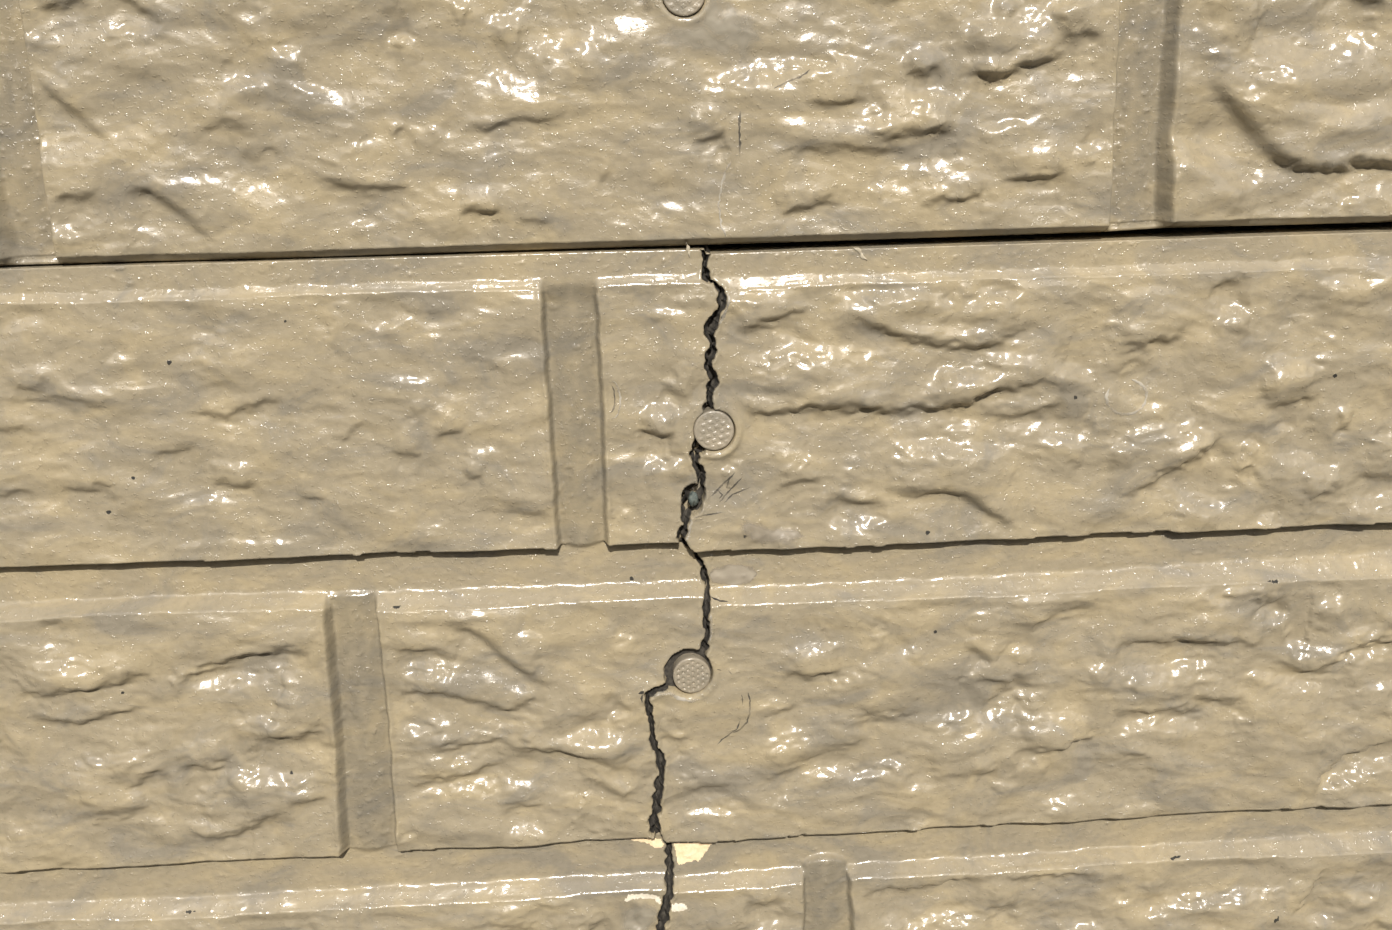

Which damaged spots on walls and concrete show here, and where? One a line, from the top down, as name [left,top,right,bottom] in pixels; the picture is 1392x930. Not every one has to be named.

crack [638,245,751,930]